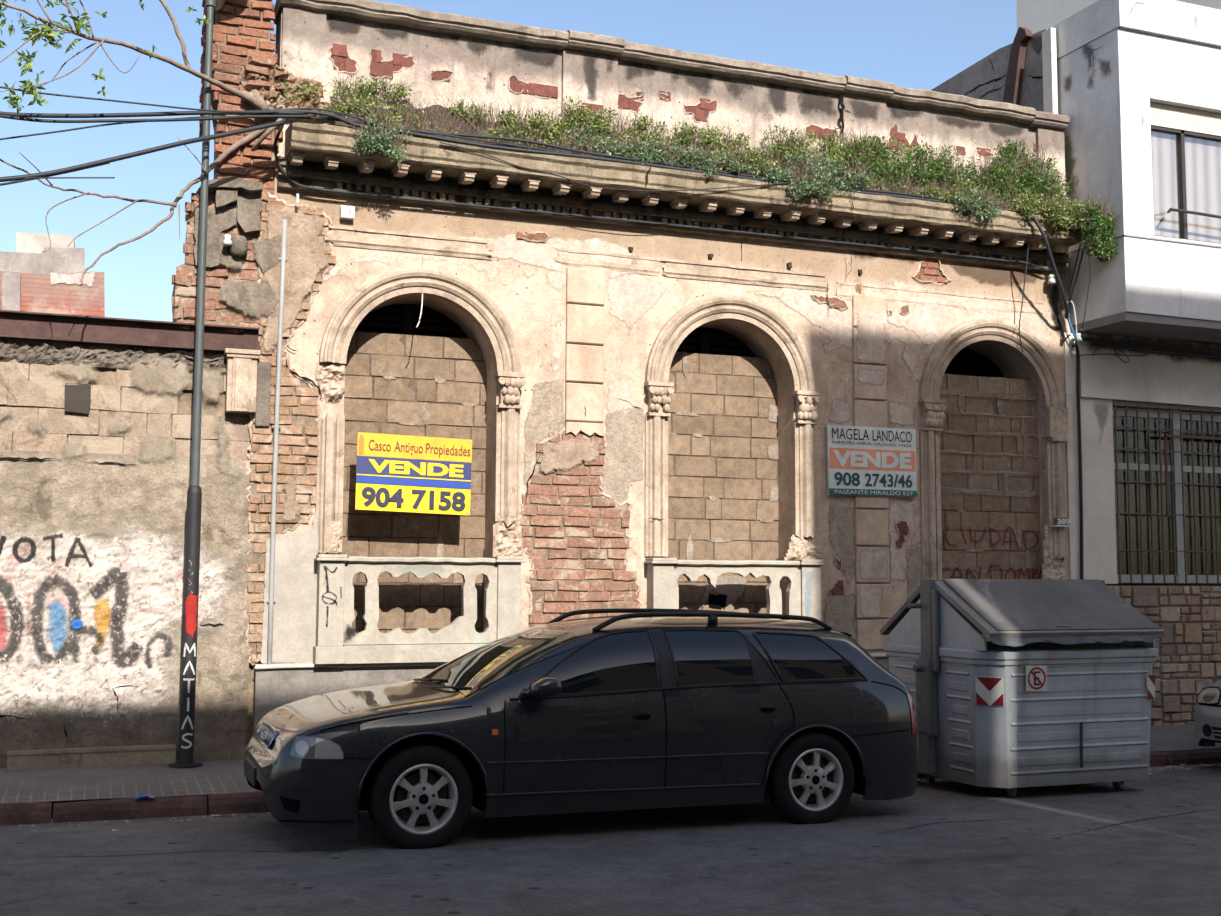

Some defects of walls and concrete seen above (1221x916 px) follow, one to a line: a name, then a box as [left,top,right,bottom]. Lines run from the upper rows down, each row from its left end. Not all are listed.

spalling [328,43,416,80]
spalling [507,74,559,99]
damp [516,47,557,66]
damp [584,56,612,100]
spalling [581,91,718,123]
damp [769,83,835,114]
crack [836,92,851,135]
damp [851,100,920,118]
damp [938,116,1022,137]
crack [965,59,1043,98]
peeling [748,258,1049,385]
spalling [493,350,645,629]